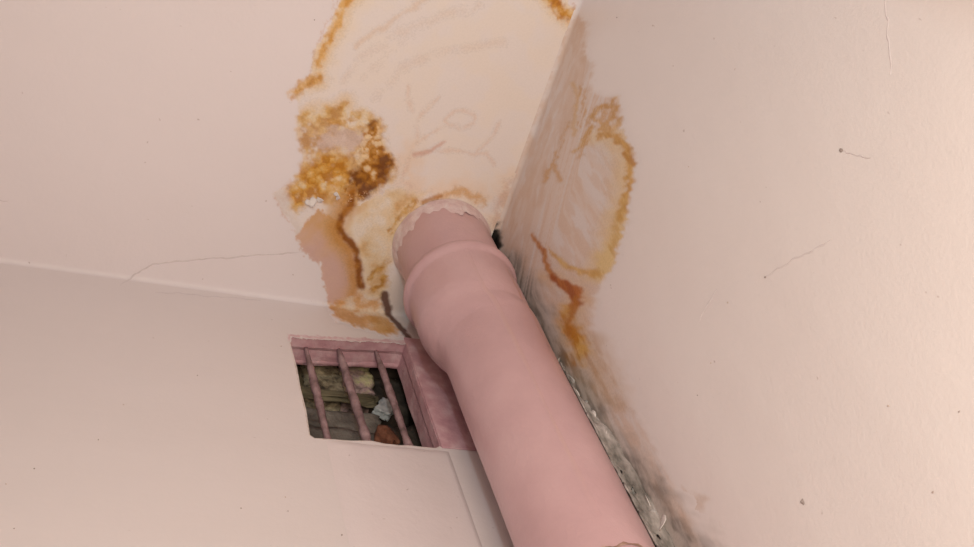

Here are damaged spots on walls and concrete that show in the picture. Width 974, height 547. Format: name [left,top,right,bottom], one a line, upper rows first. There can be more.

leakage [284,0,730,547]